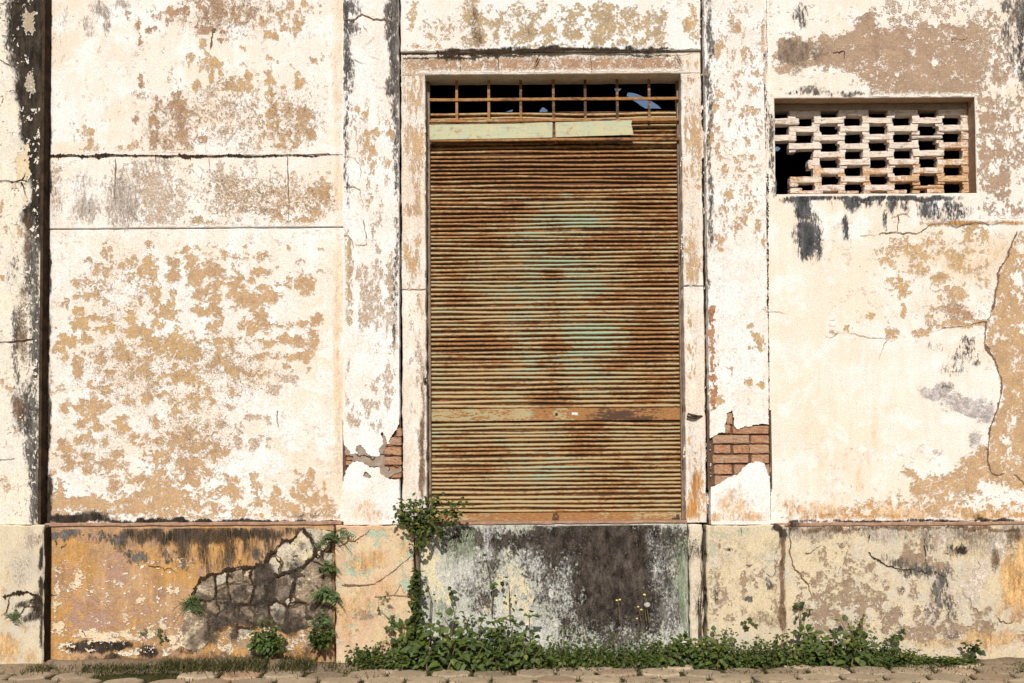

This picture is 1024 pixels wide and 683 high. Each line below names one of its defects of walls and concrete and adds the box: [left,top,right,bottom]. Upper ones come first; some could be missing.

leakage [768,104,972,262]
leakage [4,0,337,662]
peeling [47,0,1024,561]
crack [861,211,1024,483]
peeling [50,536,244,657]
peeling [200,527,464,657]
peeling [472,527,564,626]
leakage [437,525,688,652]
crack [868,535,1013,624]